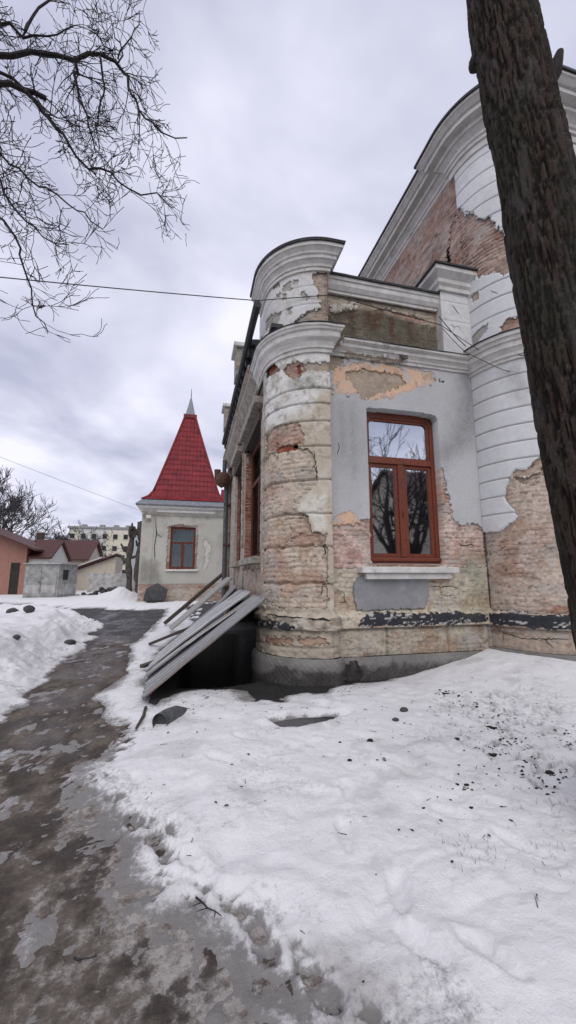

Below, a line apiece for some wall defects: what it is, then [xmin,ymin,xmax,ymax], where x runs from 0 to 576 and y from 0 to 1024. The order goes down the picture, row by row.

spalling [266,272,358,332]
peeling [268,341,444,401]
spalling [448,208,509,303]
spalling [472,315,519,345]
spalling [231,445,246,549]
spalling [243,423,374,647]
spalling [359,457,571,630]